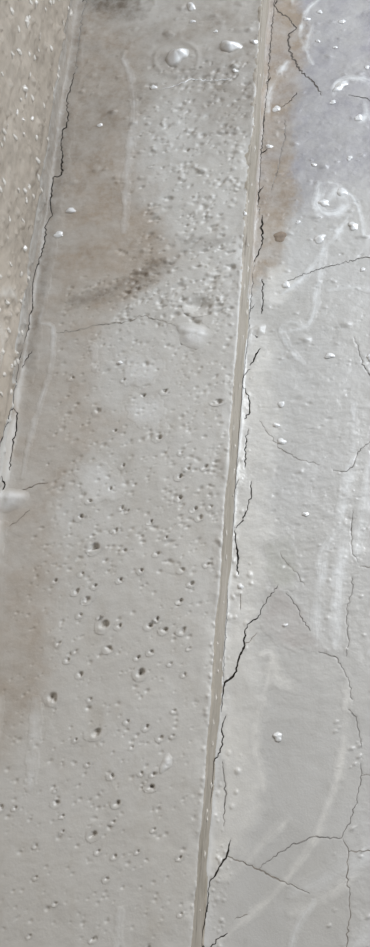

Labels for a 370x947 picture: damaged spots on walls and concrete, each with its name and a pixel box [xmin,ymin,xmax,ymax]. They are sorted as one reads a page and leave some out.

crack [0,1,87,526]
crack [60,315,173,333]
crack [202,0,370,947]